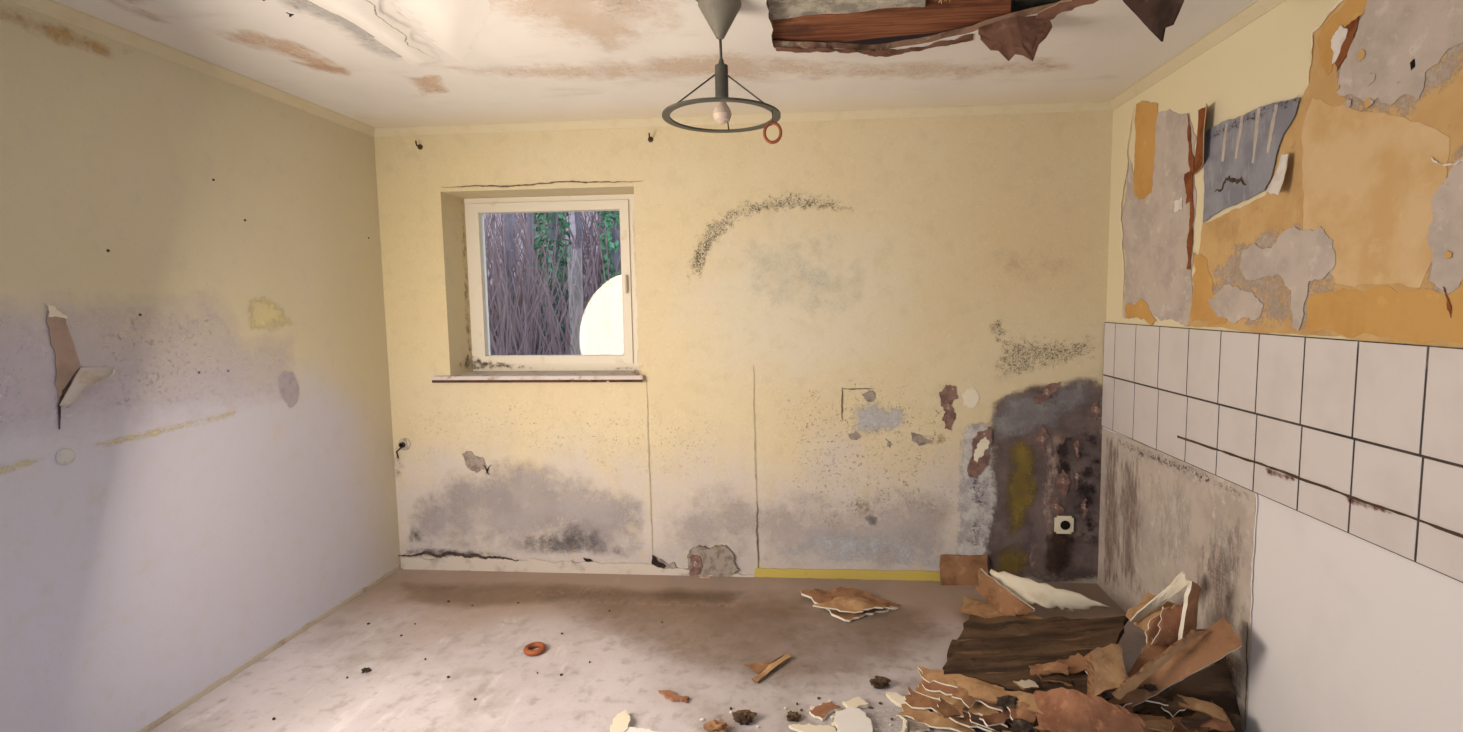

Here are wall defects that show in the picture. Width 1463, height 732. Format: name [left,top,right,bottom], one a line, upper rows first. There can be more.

crack [366,0,427,55]
spalling [773,0,1099,61]
water stain [691,194,834,272]
peeling [1119,0,1463,348]
water stain [398,468,630,561]
spalling [841,385,996,555]
water stain [984,321,1256,732]
crack [1249,493,1257,623]